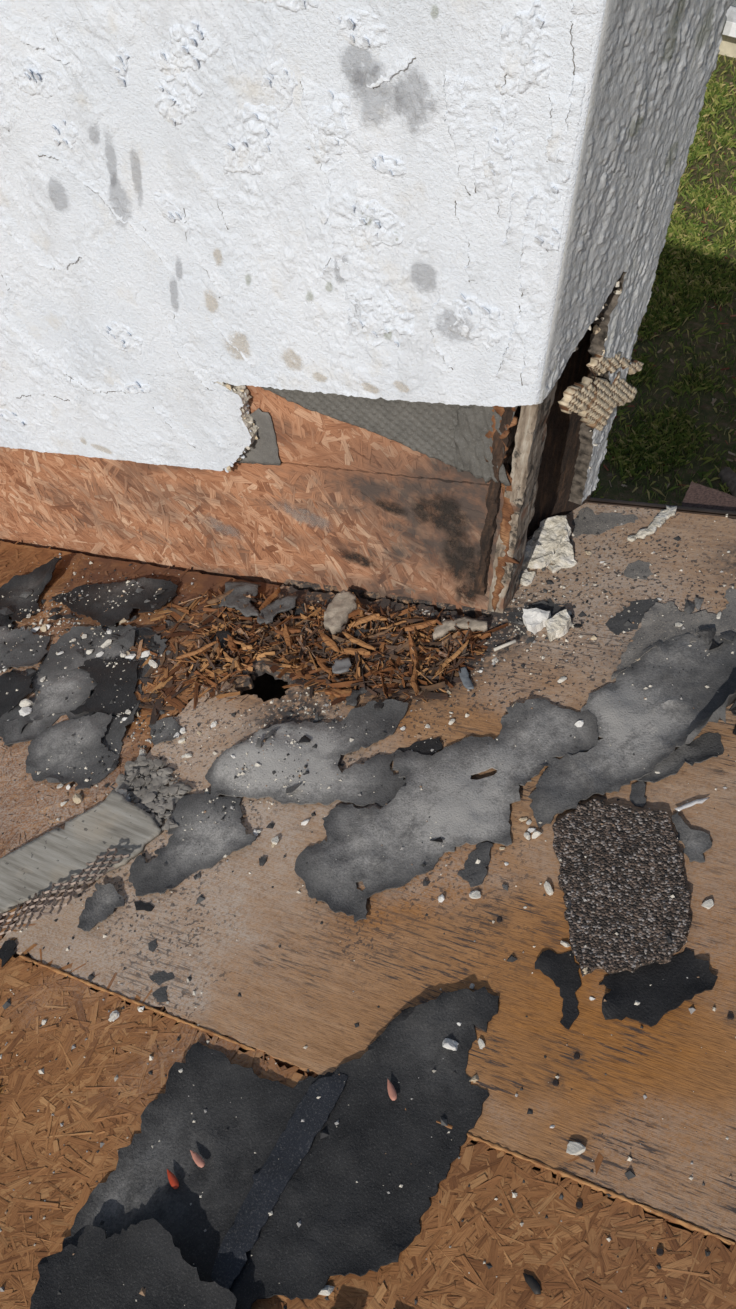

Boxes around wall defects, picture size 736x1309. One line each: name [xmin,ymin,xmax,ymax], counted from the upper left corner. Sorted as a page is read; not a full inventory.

crack [361,45,416,91]
crack [300,71,376,333]
crack [496,0,620,386]
crack [428,295,457,370]
spalling [593,277,626,354]
spalling [221,382,258,473]